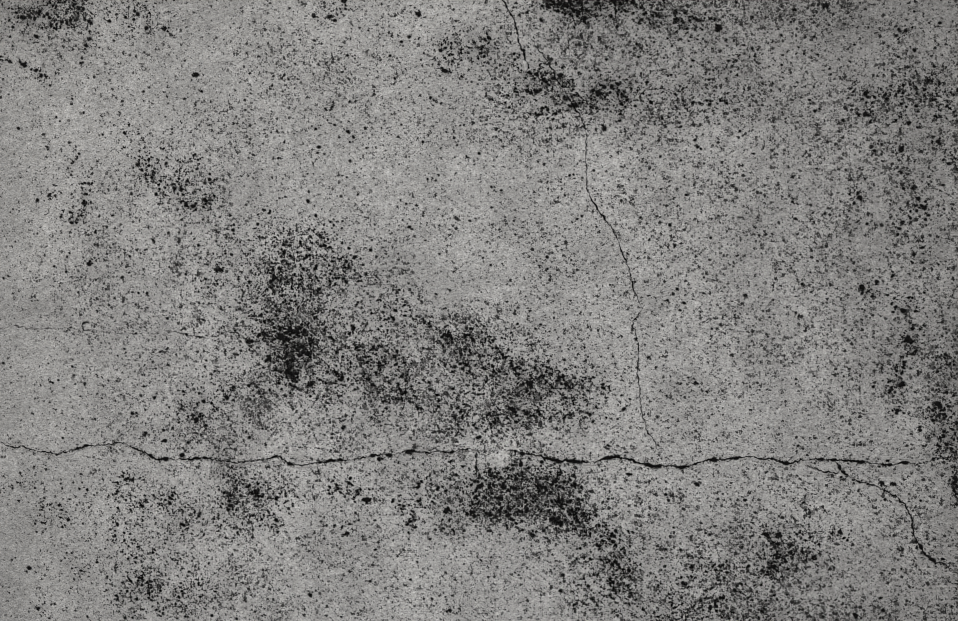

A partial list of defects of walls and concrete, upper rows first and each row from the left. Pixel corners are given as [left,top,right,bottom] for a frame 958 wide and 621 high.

crack [1,436,484,472]
crack [502,0,958,574]